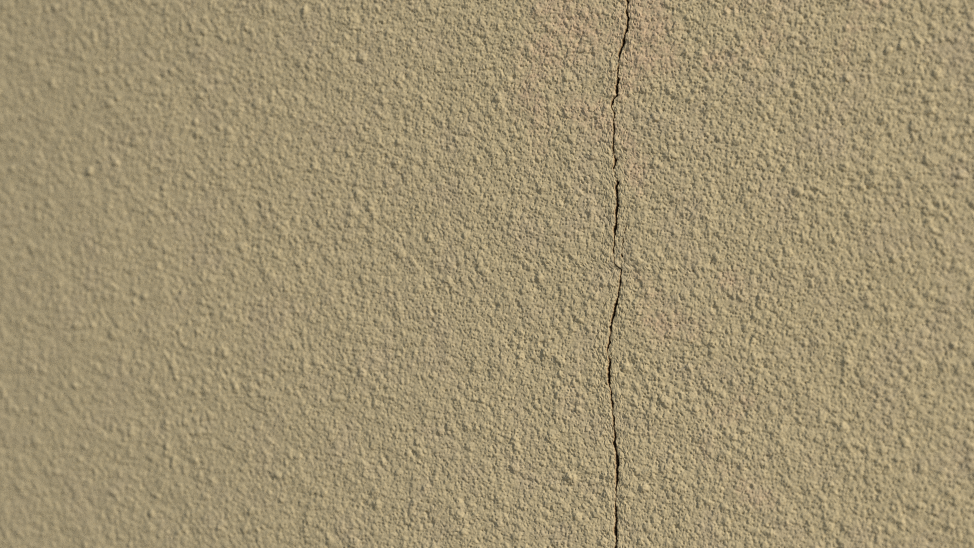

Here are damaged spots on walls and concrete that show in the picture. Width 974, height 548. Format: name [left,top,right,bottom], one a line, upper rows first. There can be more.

crack [606,0,630,548]